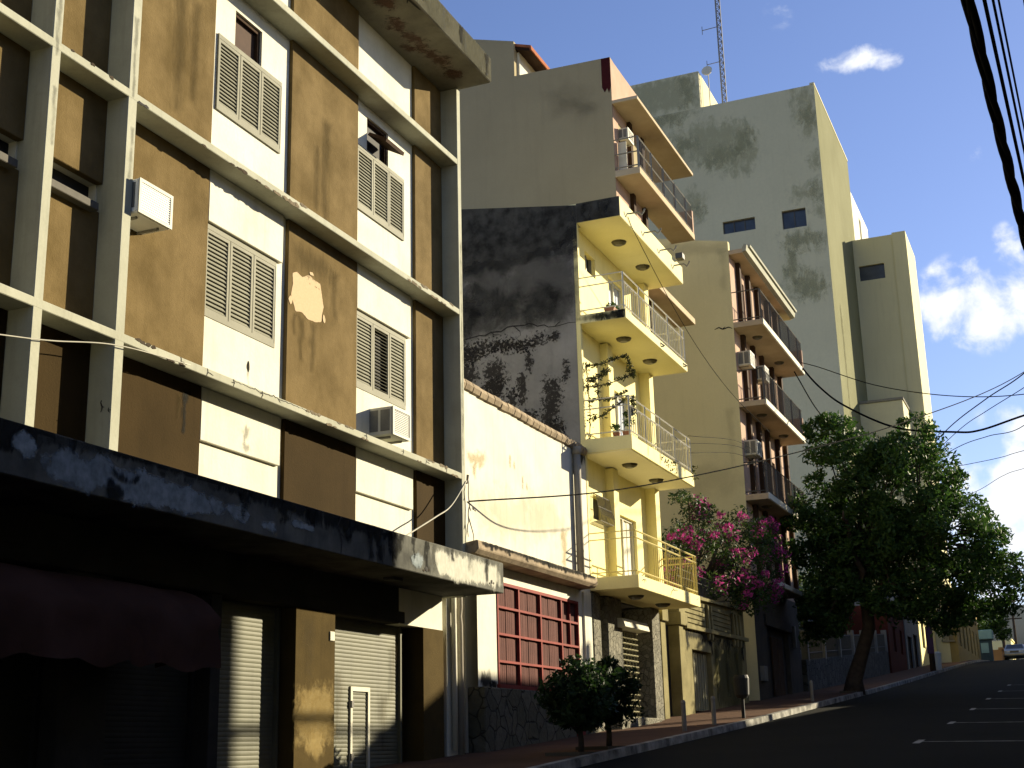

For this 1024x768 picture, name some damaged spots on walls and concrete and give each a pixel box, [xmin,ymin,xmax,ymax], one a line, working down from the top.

leakage [415,0,491,81]
peeling [289,272,325,323]
crack [463,322,574,341]
leakage [461,196,620,339]
leakage [0,418,430,569]